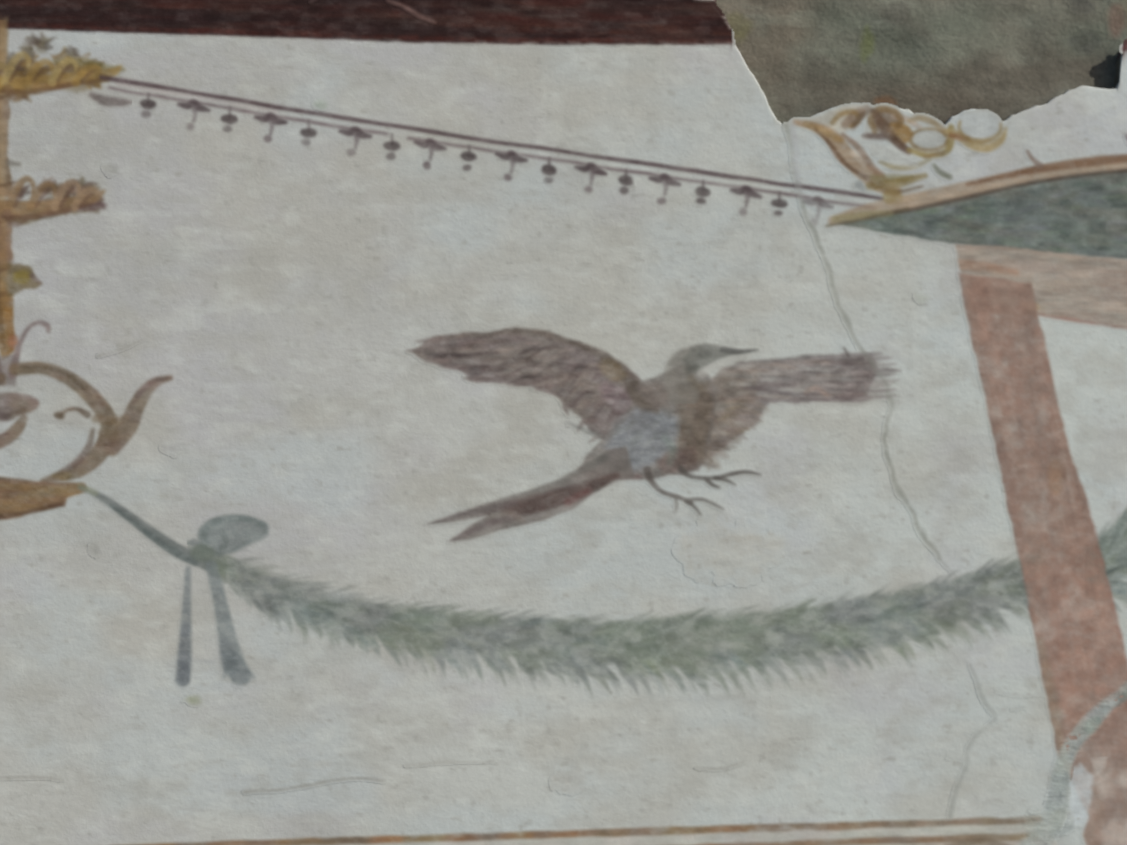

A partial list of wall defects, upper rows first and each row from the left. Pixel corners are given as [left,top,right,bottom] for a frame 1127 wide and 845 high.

crack [781,119,958,578]
crack [945,662,1044,821]
crack [1015,678,1127,845]